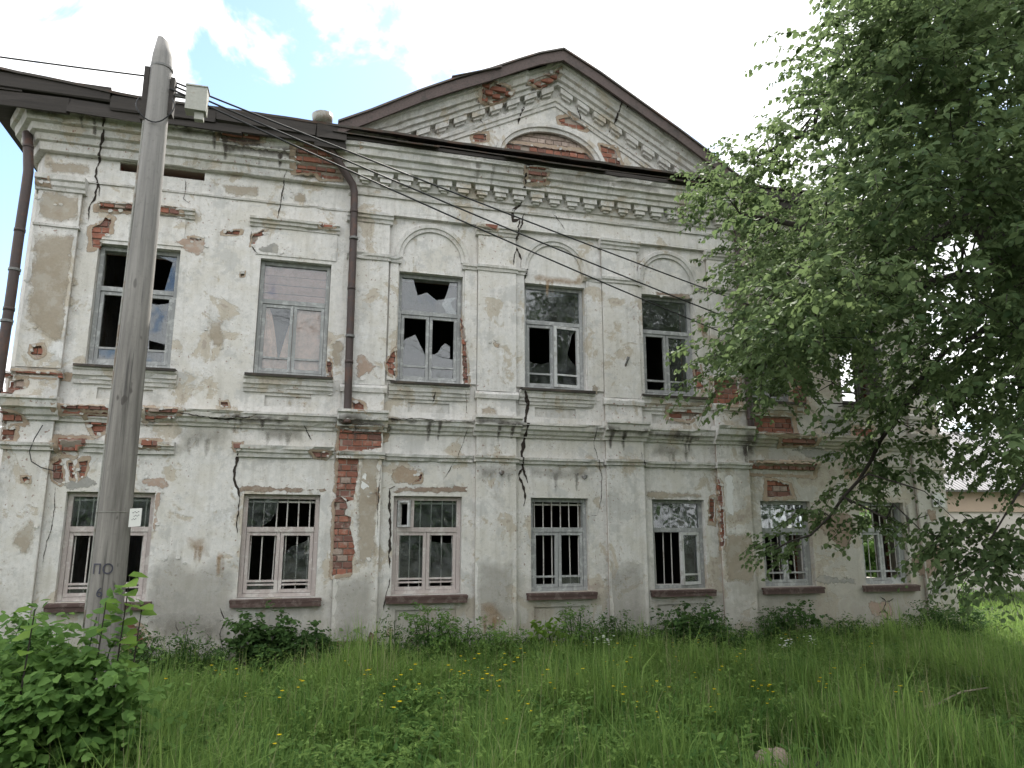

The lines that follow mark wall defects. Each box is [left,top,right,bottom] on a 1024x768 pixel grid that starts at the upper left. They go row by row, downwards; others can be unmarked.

peeling [1,162,133,395]
crack [88,117,106,220]
flaking render [160,205,185,217]
crack [511,166,528,290]
flaking render [504,111,624,187]
flaking render [48,403,109,491]
crack [232,453,240,532]
flaking render [232,397,468,582]
crack [377,465,395,610]
crack [518,390,530,506]
peeling [645,475,755,581]
flaking render [748,379,878,501]